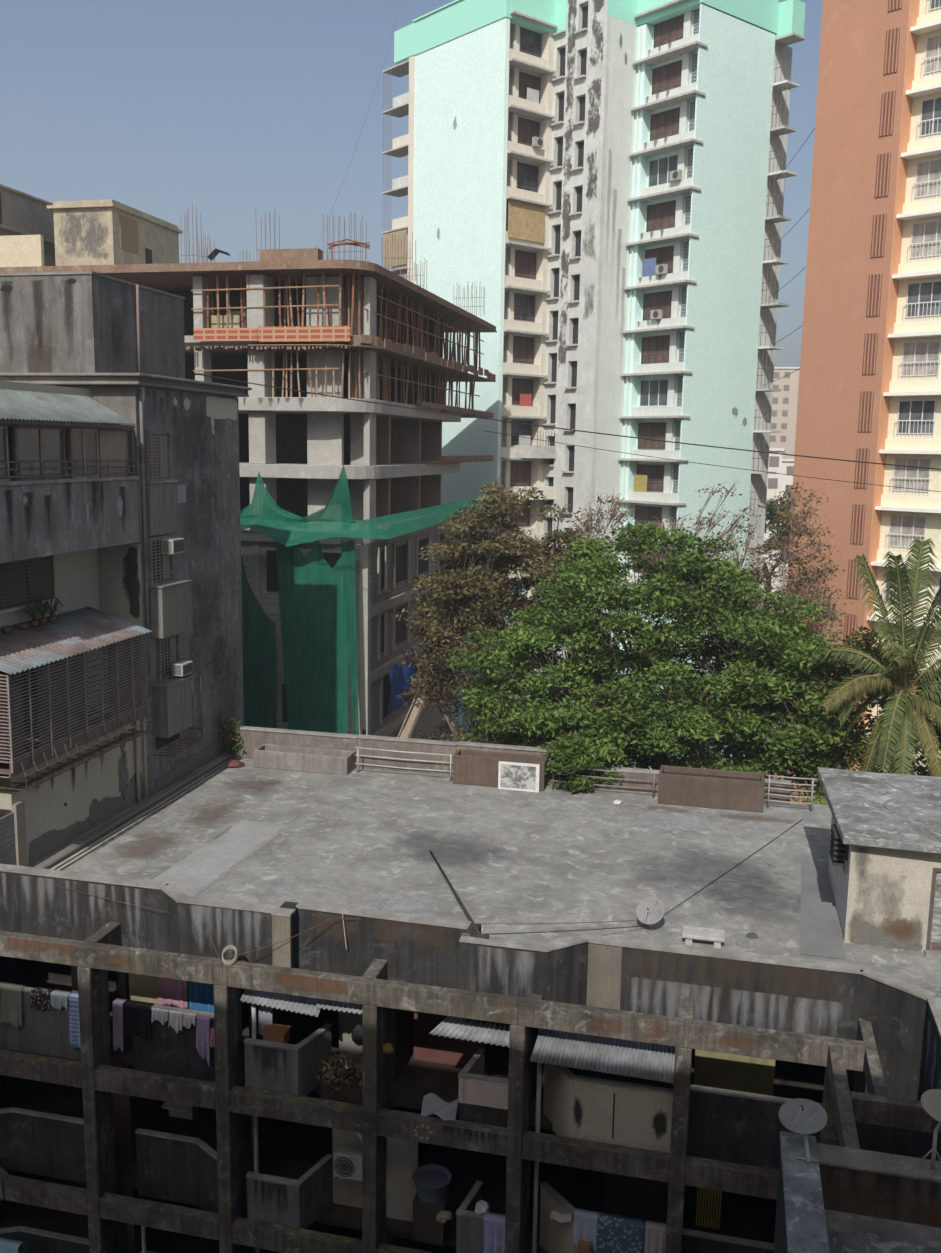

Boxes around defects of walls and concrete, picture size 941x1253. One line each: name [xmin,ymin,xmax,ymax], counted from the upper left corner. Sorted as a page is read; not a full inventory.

leakage [558,0,604,366]
leakage [28,280,51,373]
leakage [65,280,73,329]
peeling [206,396,238,440]
leakage [5,716,225,919]
leakage [70,879,134,929]
corrosion [889,921,911,937]
leakage [633,948,749,984]